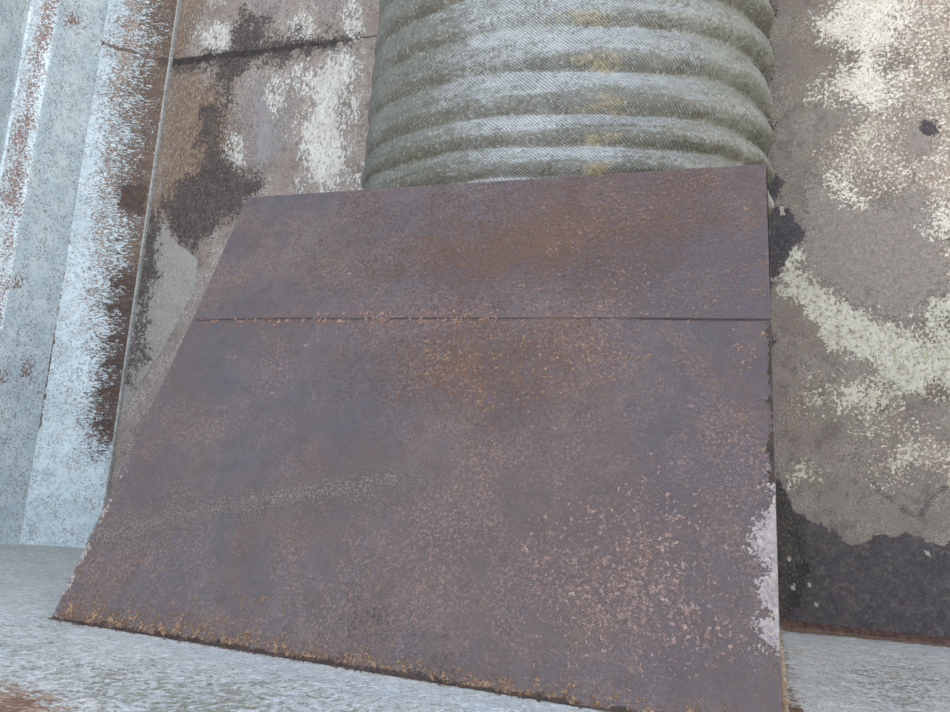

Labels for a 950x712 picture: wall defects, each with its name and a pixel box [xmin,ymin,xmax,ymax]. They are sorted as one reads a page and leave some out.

crack [101,40,169,68]
rust [62,0,258,467]
leakage [157,0,362,254]
rust [799,0,950,296]
rust [51,167,950,712]
leakage [776,478,950,638]
rust [0,676,104,712]